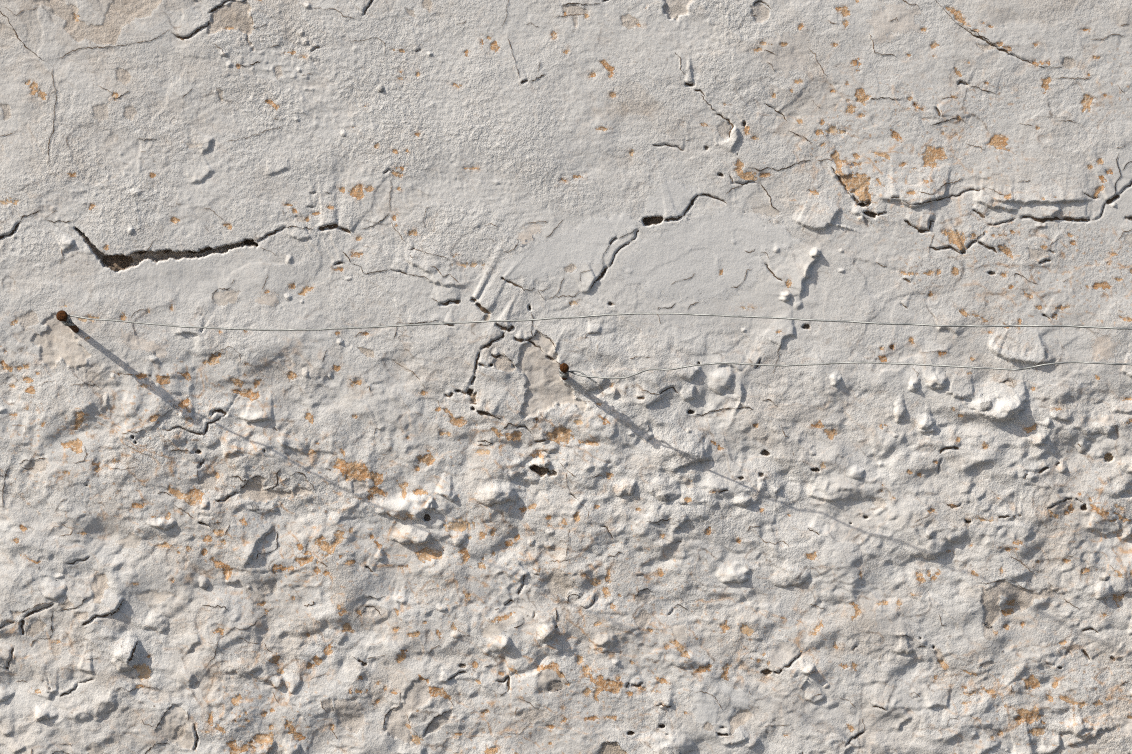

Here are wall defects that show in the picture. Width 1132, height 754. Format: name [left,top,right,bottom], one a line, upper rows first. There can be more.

crack [870,0,1088,79]
crack [0,0,280,159]
crack [675,53,734,137]
crack [664,103,1132,288]
crack [0,210,78,263]
spalling [75,227,258,272]
peeling [497,177,804,304]
peeling [15,310,93,369]
peeling [513,330,588,419]
crack [123,405,226,476]
spalling [530,465,557,477]
peeling [761,636,800,676]